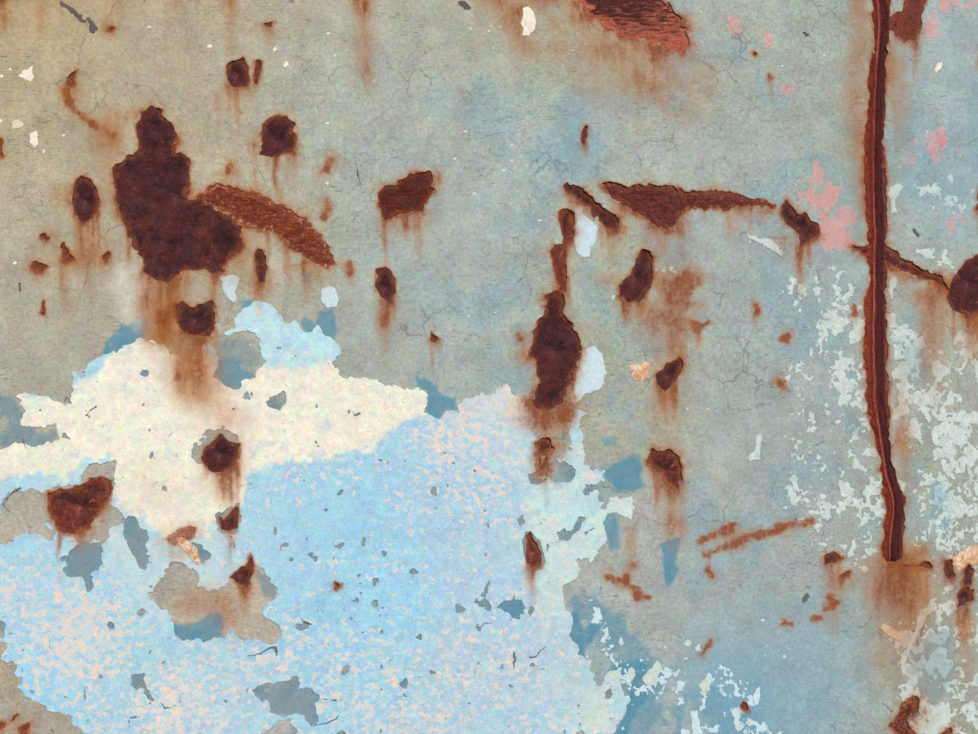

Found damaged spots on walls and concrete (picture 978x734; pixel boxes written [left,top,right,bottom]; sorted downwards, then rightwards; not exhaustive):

corrosion [253,114,298,185]
corrosion [112,106,268,388]
spalling [197,183,336,281]
corrosion [377,170,440,240]
corrosion [516,183,624,478]
peeling [574,206,598,258]
spalling [600,181,777,235]
corrosion [919,254,978,336]
peeling [782,266,886,573]
corrosion [47,476,113,547]
peeling [0,275,783,734]
peeling [881,313,978,734]